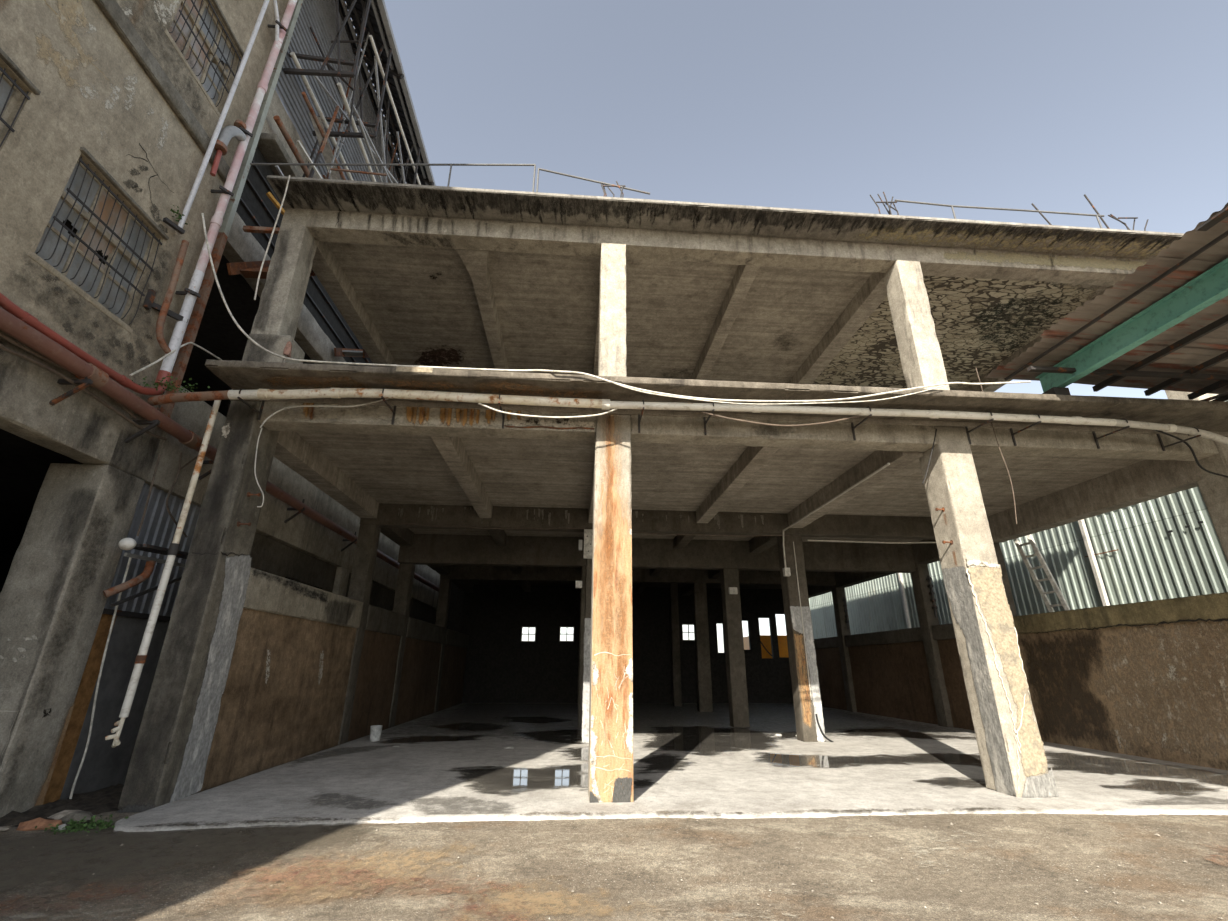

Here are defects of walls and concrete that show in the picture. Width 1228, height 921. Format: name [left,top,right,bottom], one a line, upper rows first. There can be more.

damp [271,179,1181,270]
damp [971,292,1076,352]
corrosion [406,407,521,426]
corrosion [589,414,634,803]
corrosion [794,634,811,726]
damp [1021,632,1121,751]